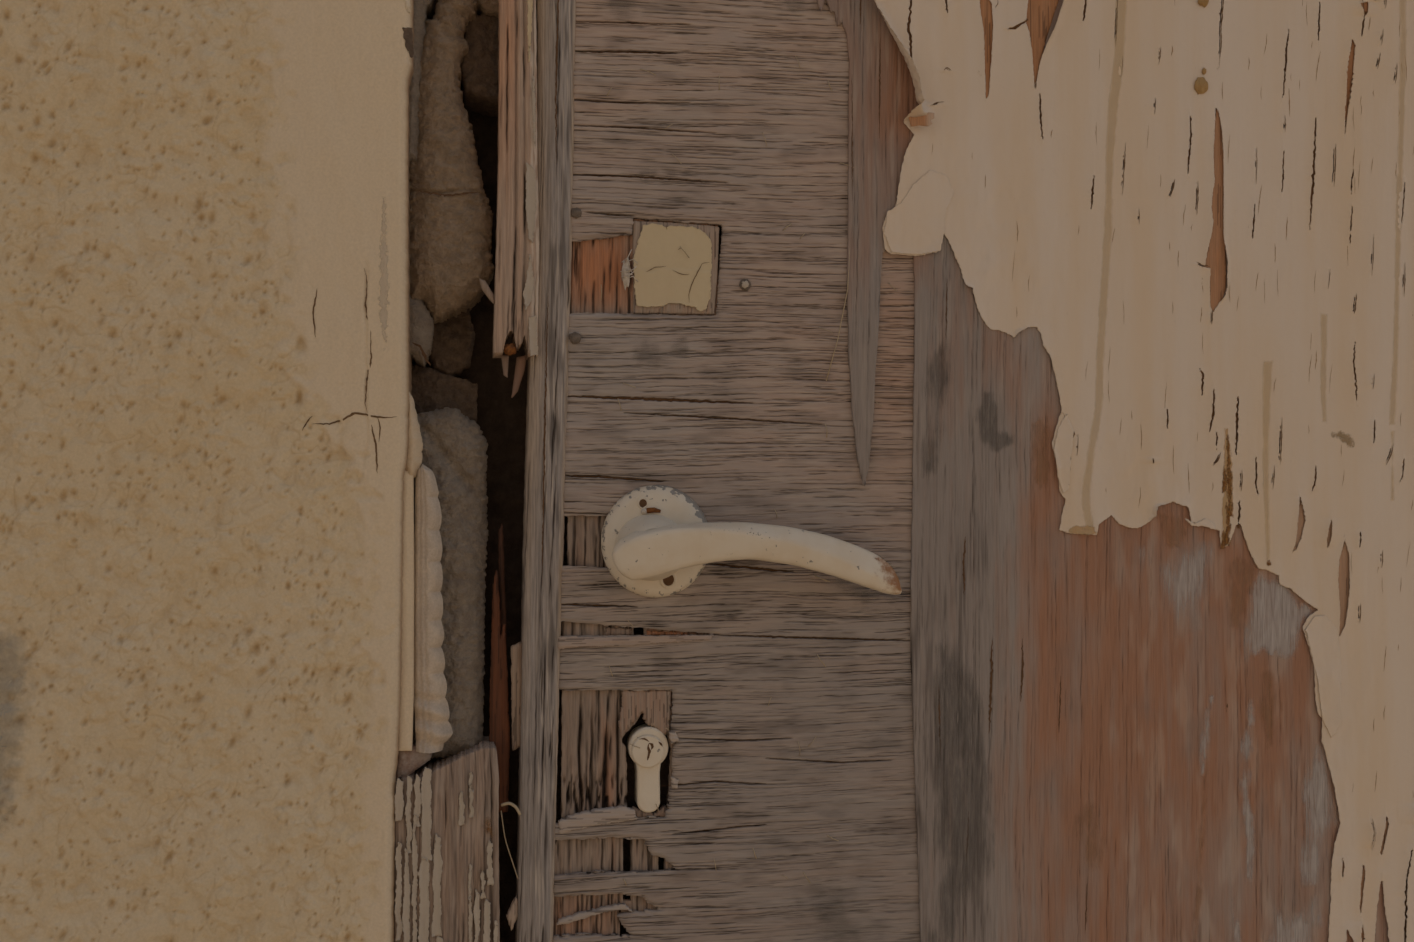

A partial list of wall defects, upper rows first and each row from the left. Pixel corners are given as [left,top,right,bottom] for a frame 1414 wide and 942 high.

peeling [980,0,993,98]
peeling [1026,0,1059,84]
peeling [1345,40,1355,128]
peeling [884,170,954,255]
peeling [1204,109,1226,312]
crack [302,269,393,471]
peeling [1054,414,1074,493]
spalling [456,110,538,942]
peeling [1185,519,1216,530]
peeling [1293,497,1306,551]
peeling [1305,521,1350,738]
peeling [394,758,450,942]